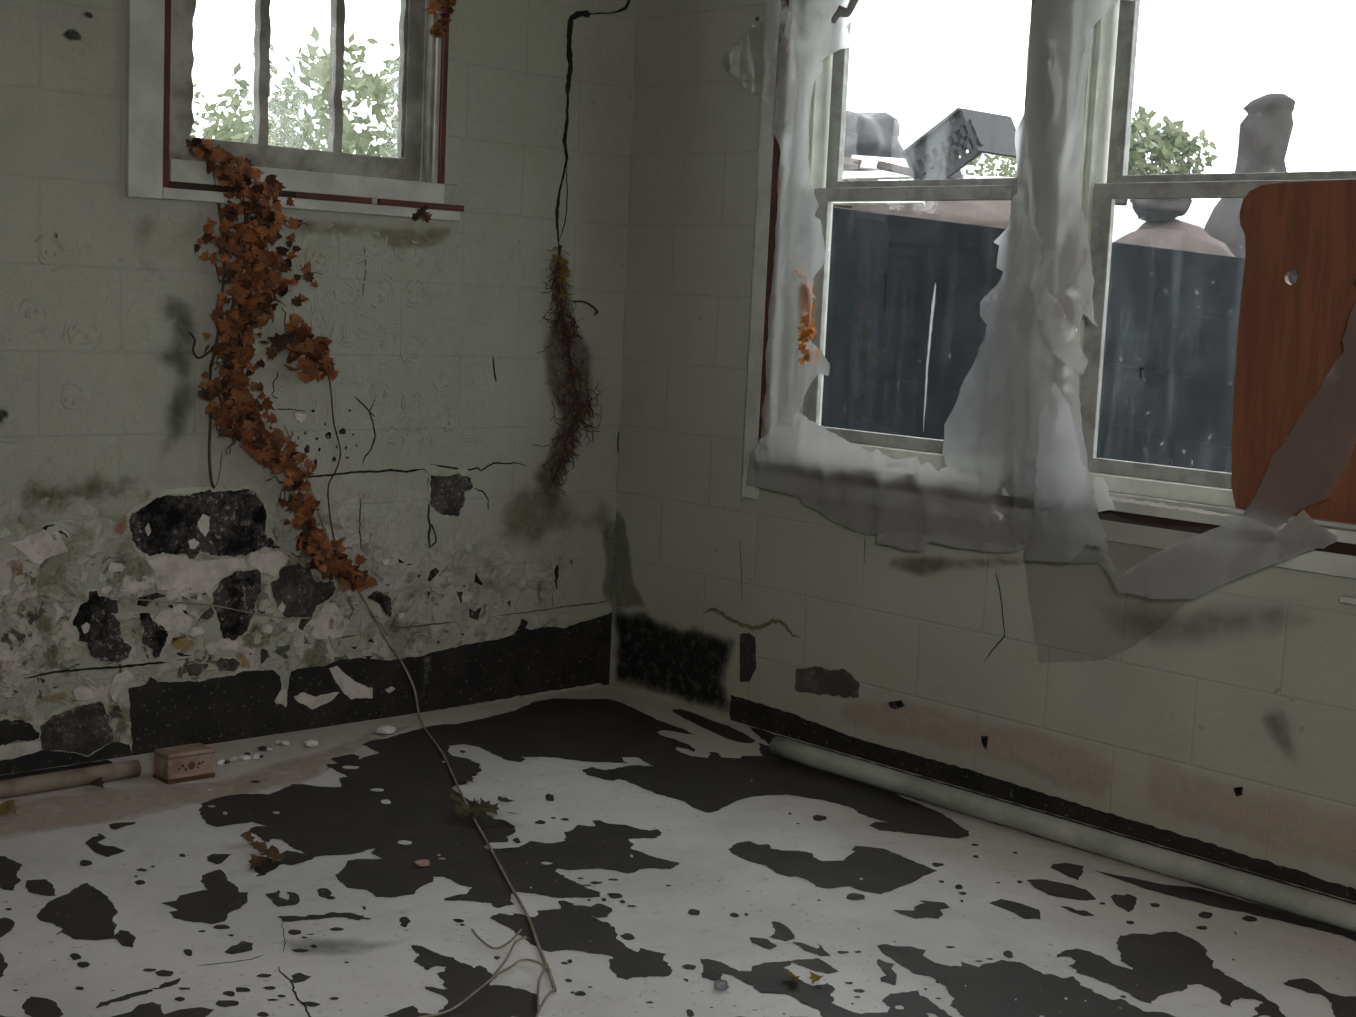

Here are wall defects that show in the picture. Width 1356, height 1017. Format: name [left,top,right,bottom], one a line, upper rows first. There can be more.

crack [303,396,526,550]
peeling [427,472,474,518]
peeling [0,484,440,759]
peeling [455,543,511,636]
peeling [792,666,860,699]
peeling [0,856,136,968]
peeling [80,822,136,866]
peeling [162,854,254,954]
peeling [199,698,1356,1017]
peeling [0,953,8,978]
peeling [13,989,64,1017]
peeling [96,968,339,1017]